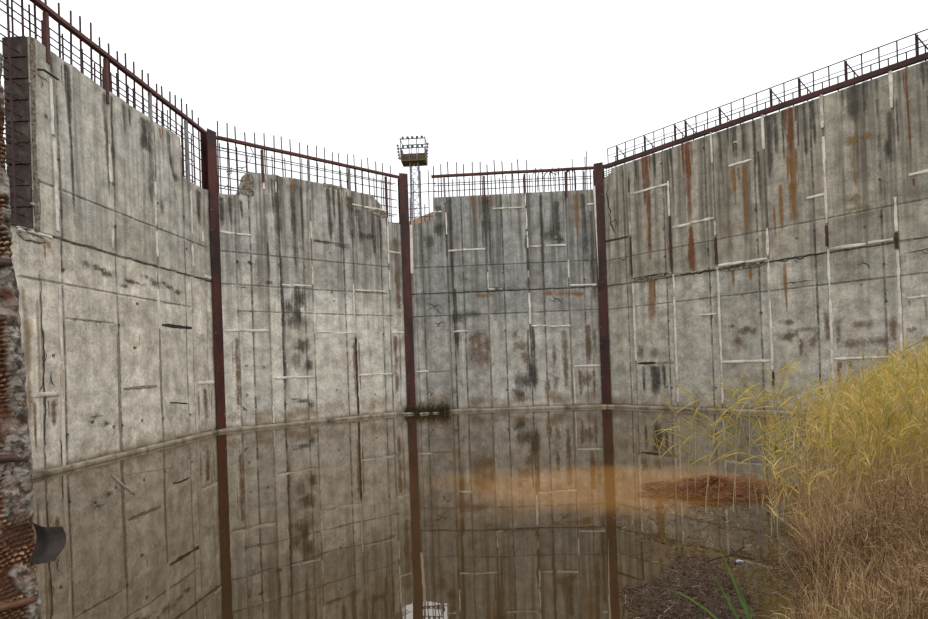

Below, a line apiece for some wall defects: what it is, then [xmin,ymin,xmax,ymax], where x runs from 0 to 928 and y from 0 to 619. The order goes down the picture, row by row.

leakage [103,94,115,185]
leakage [141,118,152,156]
leakage [290,186,303,237]
spalling [217,121,398,224]
spalling [409,151,612,225]
leakage [539,195,563,258]
rust [641,154,651,249]
rust [681,140,692,214]
rust [732,166,748,231]
rust [773,106,797,228]
leakage [885,99,899,157]
leakage [266,243,304,381]